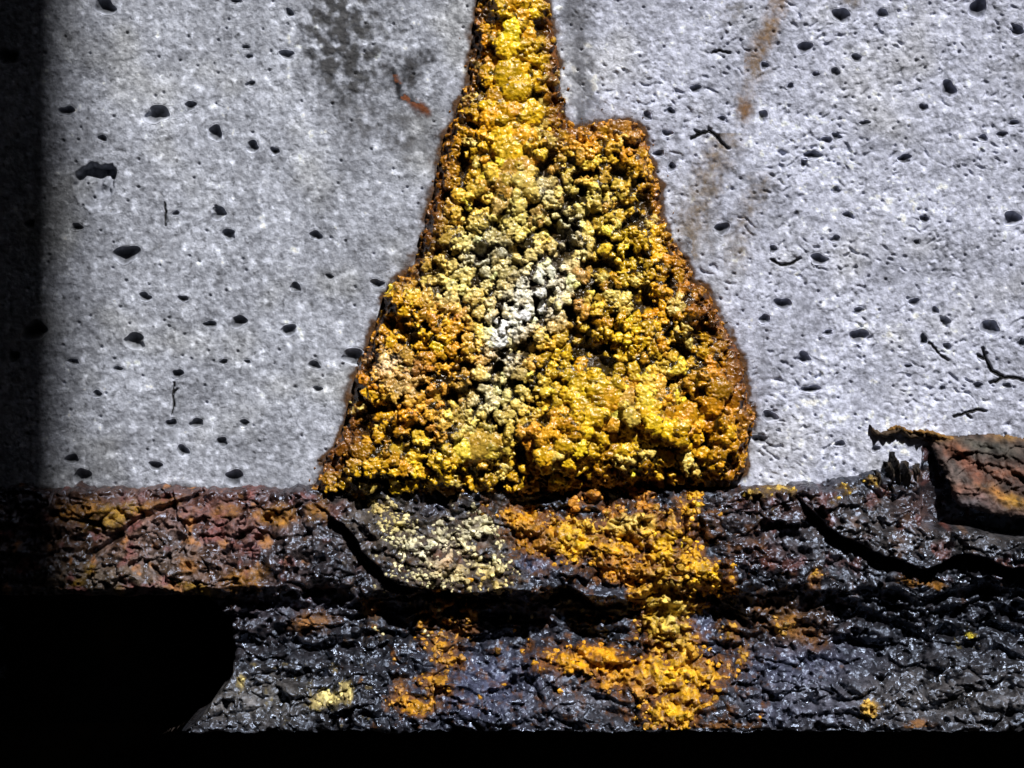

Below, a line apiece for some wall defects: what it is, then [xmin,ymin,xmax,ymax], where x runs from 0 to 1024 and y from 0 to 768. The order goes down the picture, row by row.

rust [393,51,433,115]
crack [977,348,1024,383]
rust [57,500,178,526]
rust [260,507,294,526]
rust [178,558,211,597]
rust [225,570,259,590]
rust [909,719,927,728]